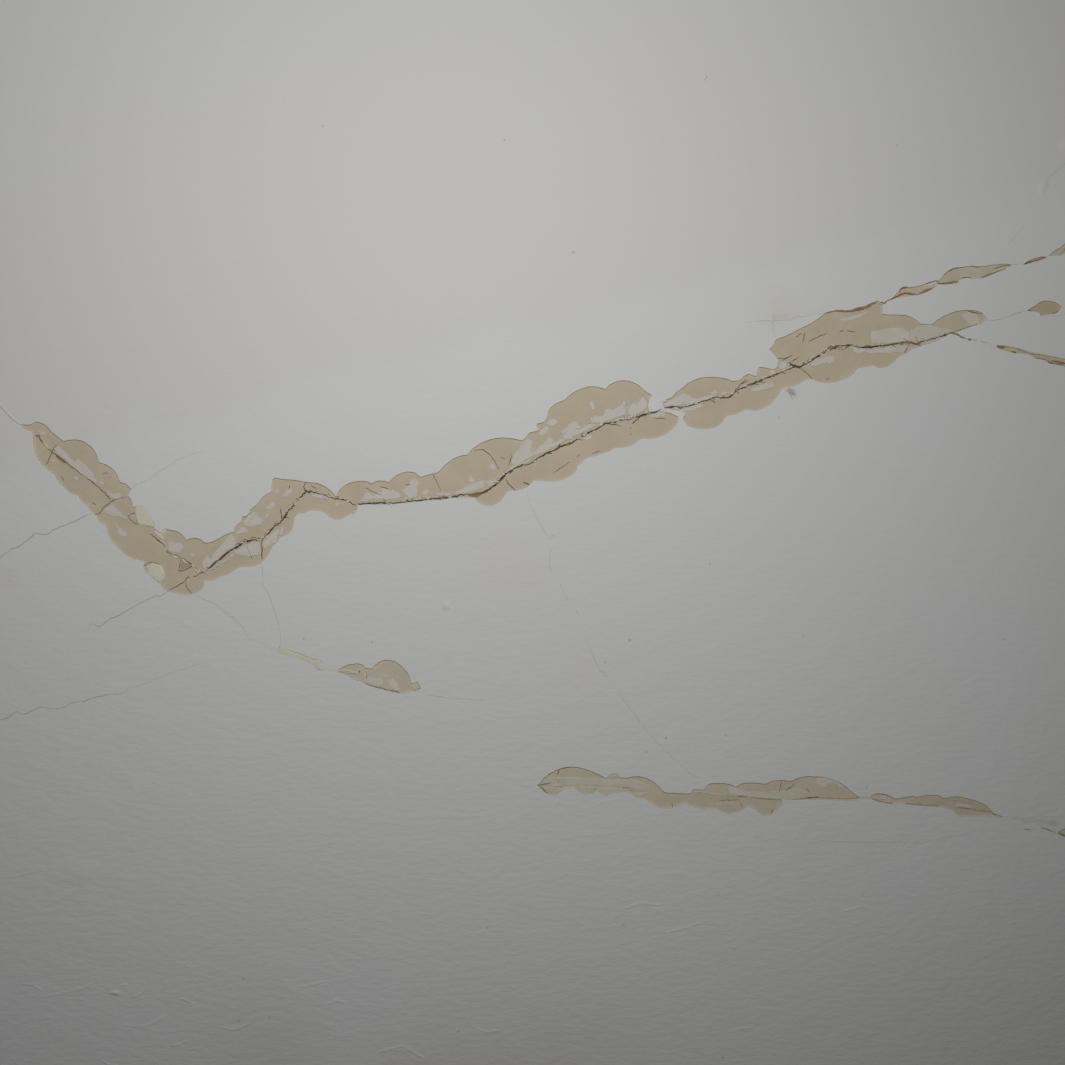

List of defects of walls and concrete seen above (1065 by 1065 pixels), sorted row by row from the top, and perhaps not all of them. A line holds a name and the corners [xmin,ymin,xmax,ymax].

peeling [1023,244,1065,265]
peeling [1027,301,1061,315]
peeling [986,343,1065,367]
peeling [22,264,1010,595]
crack [0,435,200,558]
crack [90,299,1064,649]
crack [0,662,203,720]
peeling [260,643,421,693]
peeling [538,767,1001,817]